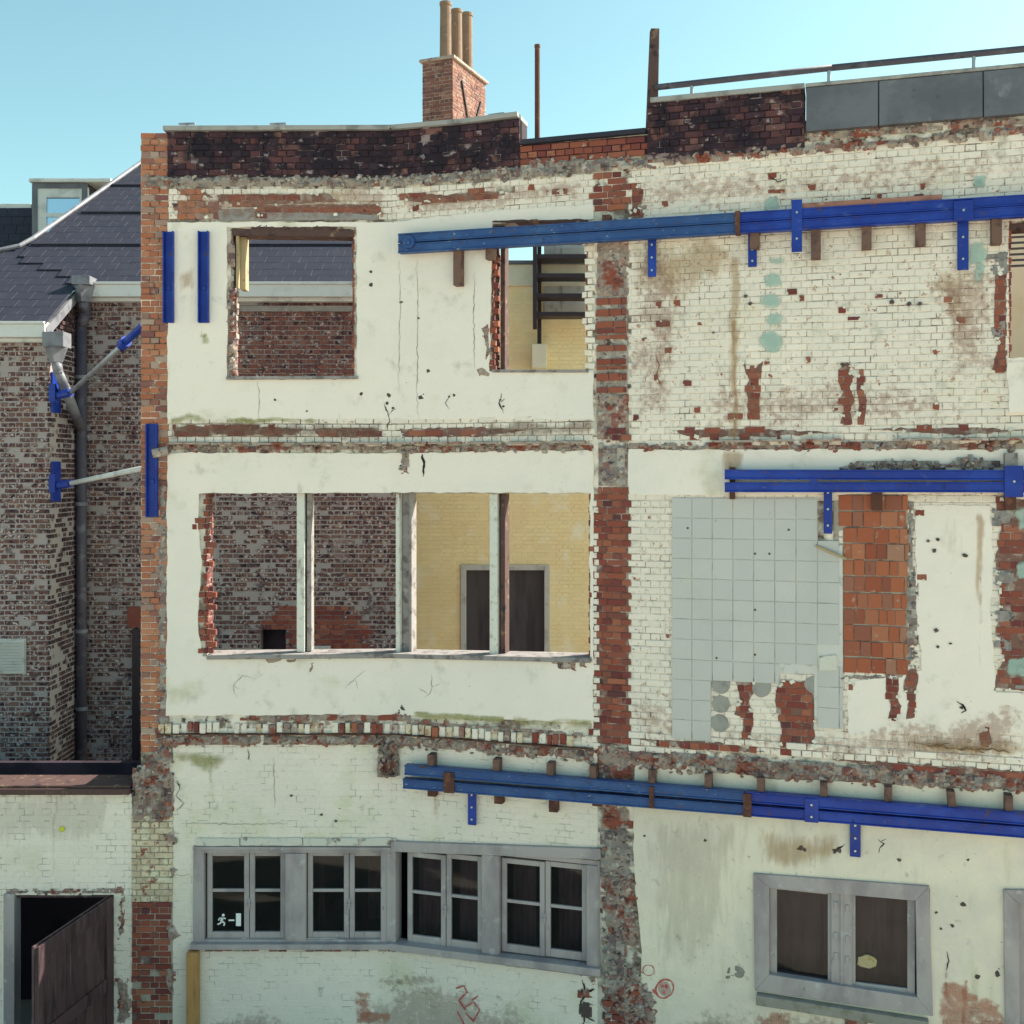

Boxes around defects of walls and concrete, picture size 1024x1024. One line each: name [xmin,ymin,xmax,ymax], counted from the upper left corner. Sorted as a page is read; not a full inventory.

flaking render [396,188,508,211]
flaking render [629,183,647,219]
crack [384,259,419,429]
flaking render [672,359,825,440]
flaking render [833,362,1019,435]
spalling [132,483,177,848]
flaking render [775,679,817,756]
flaking render [885,666,919,722]